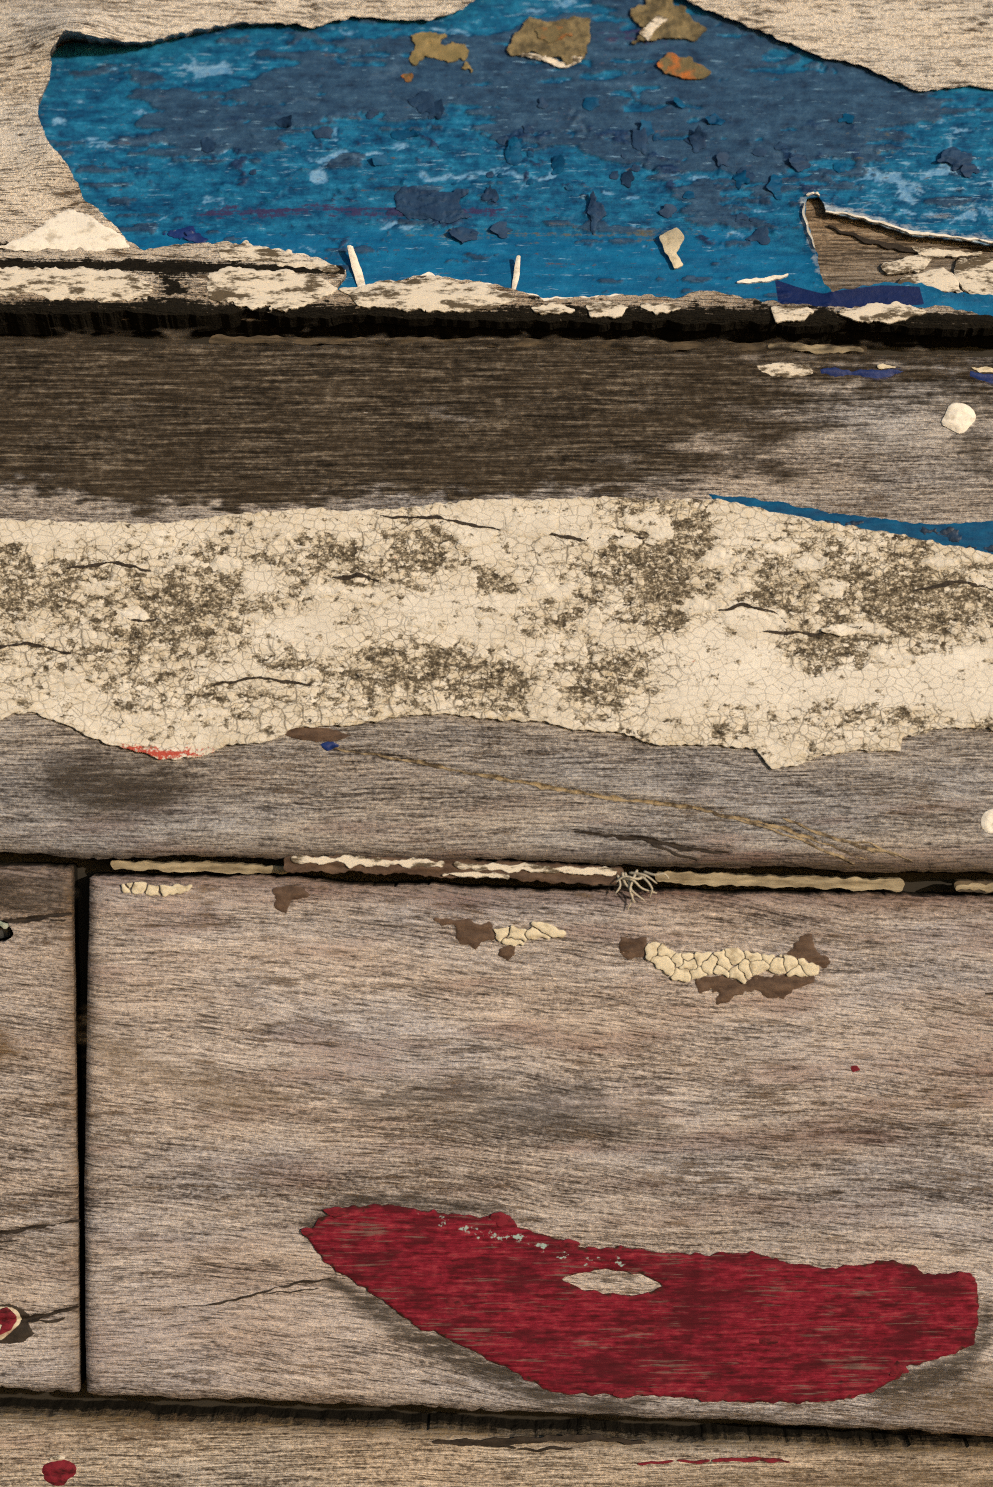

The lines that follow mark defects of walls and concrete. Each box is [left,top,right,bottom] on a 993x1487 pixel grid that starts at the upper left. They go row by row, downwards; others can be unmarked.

peeling [0,0,993,324]
peeling [0,494,993,769]
peeling [494,921,567,946]
peeling [645,942,819,984]
crack [0,1219,81,1242]
crack [20,1306,79,1323]
peeling [301,1204,979,1404]